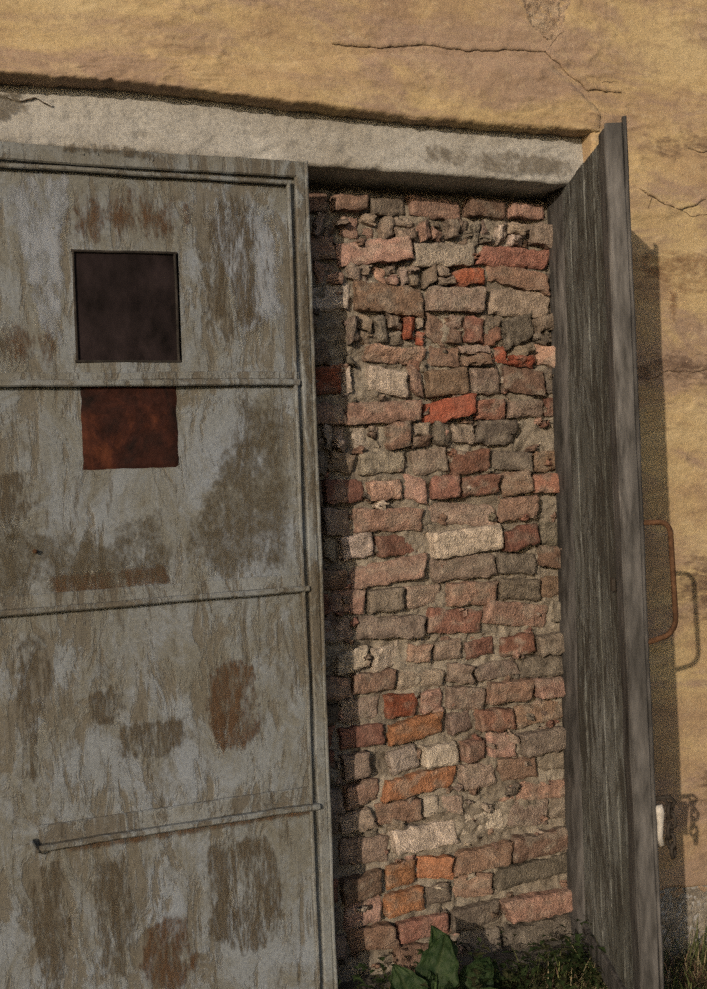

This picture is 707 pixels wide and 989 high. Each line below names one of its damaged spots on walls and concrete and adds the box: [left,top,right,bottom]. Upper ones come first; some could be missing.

flaking render [522,0,571,40]
crack [332,32,622,93]
crack [639,184,707,217]
rust [208,660,259,752]
rust [142,918,197,989]
flaking render [660,886,707,959]